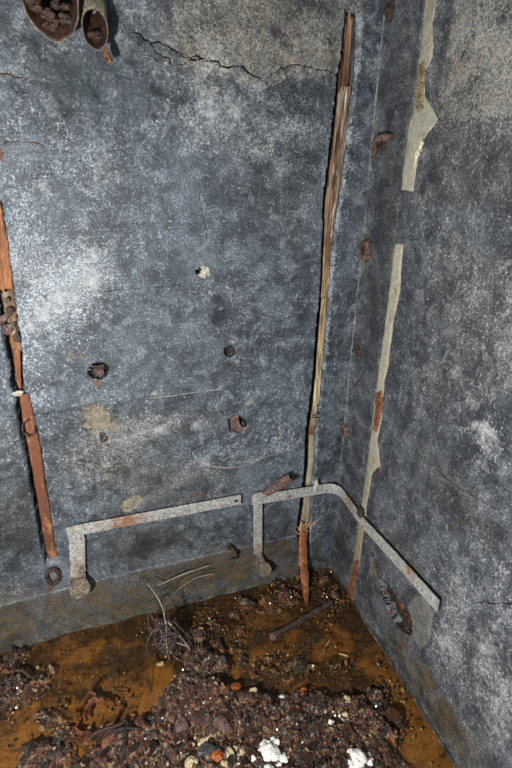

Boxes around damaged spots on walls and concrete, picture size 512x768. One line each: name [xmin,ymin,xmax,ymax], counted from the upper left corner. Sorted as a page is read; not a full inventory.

crack [132,31,336,79]
corrosion [0,200,58,558]
corrosion [373,391,383,432]
corrosion [347,560,359,602]
corrosion [269,600,333,641]
corrosion [379,577,412,636]